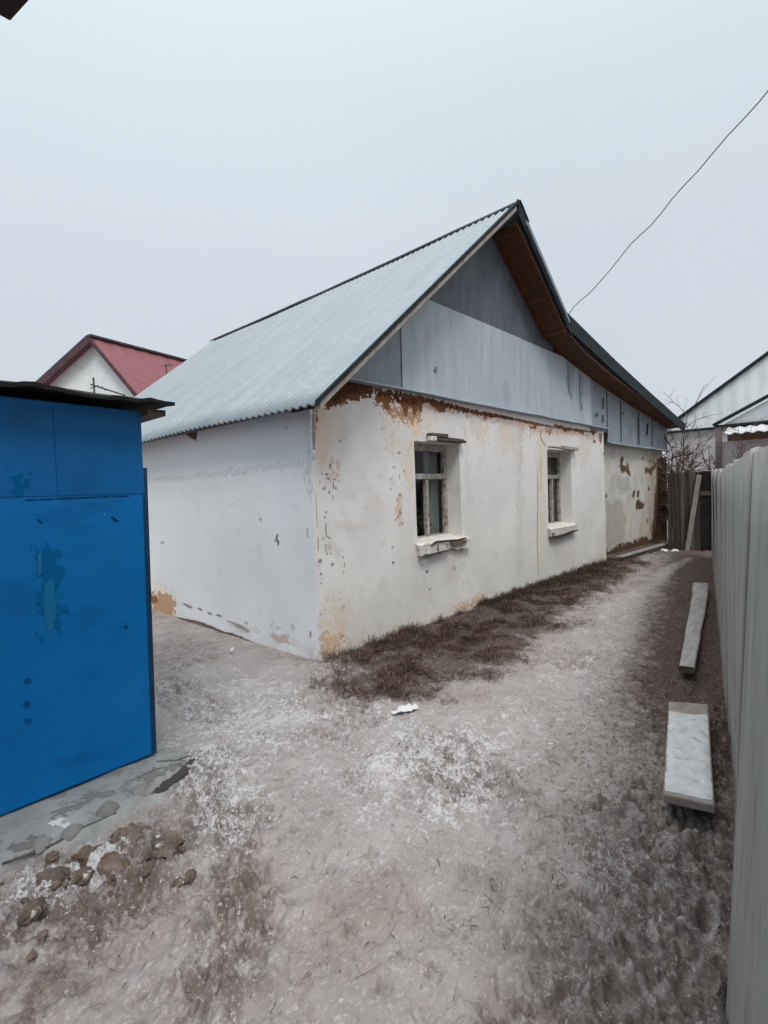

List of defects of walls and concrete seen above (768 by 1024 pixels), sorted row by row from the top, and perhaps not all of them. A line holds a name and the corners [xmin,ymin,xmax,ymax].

flaking render [324,382,605,455]
peeling [319,456,341,499]
flaking render [606,456,667,555]
flaking render [151,590,248,624]